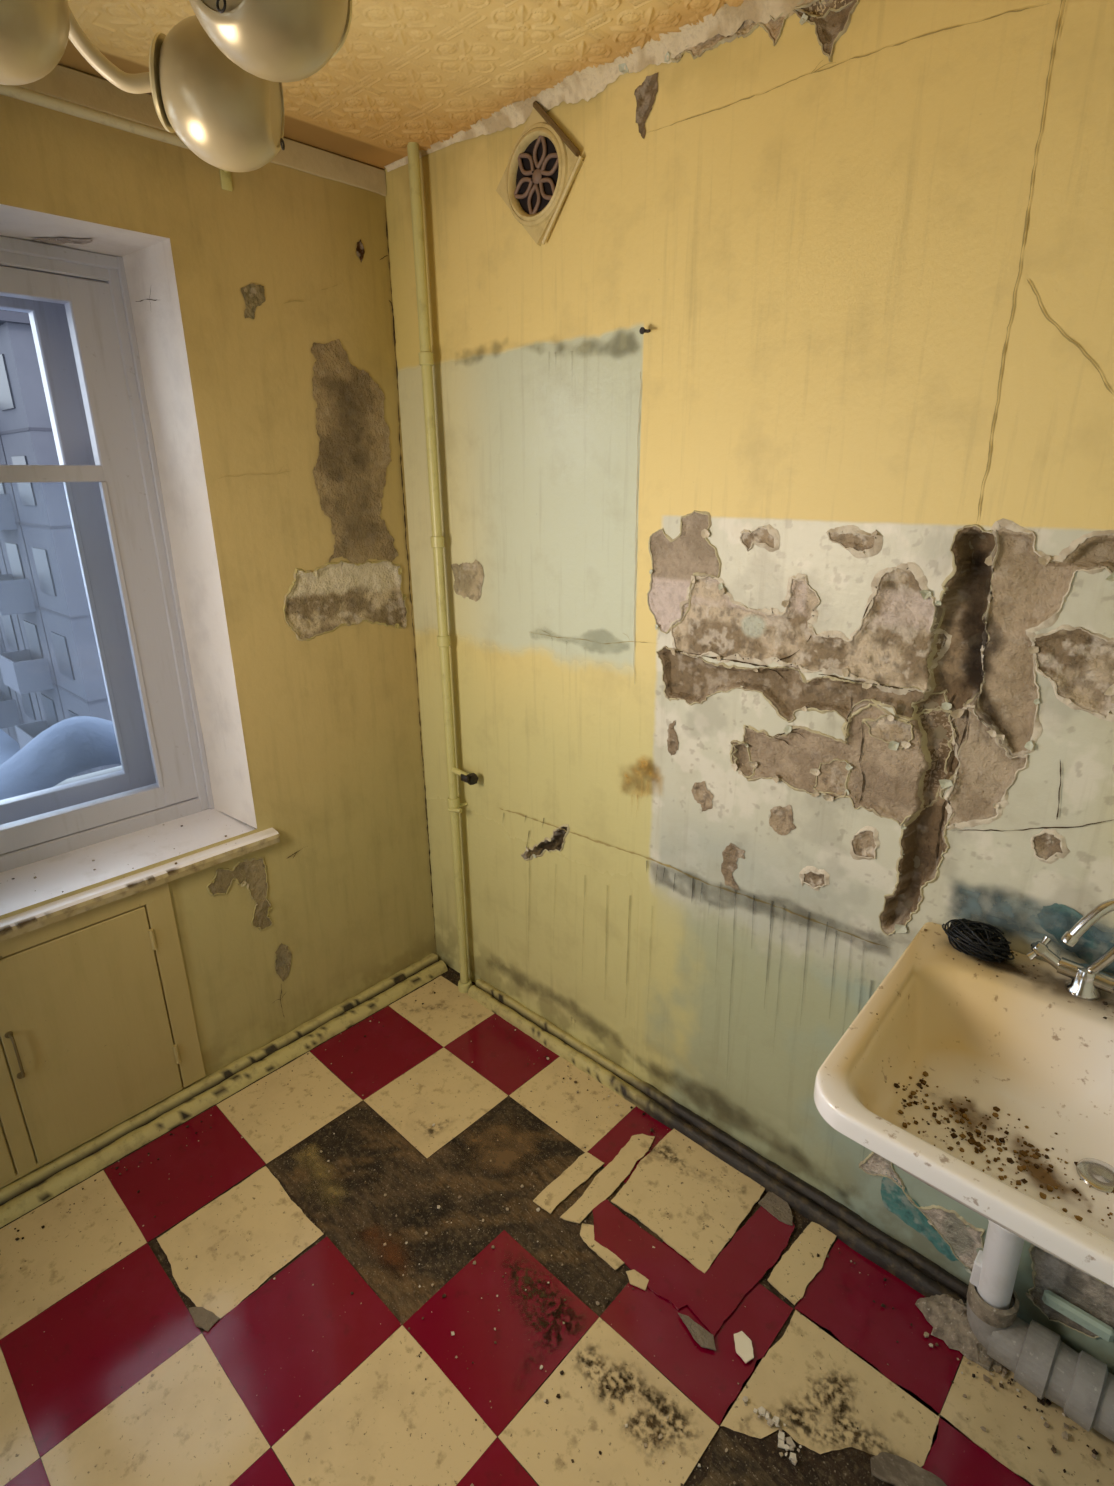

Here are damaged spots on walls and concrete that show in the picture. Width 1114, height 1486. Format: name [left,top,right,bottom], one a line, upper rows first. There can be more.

peeling [618,0,860,139]
crack [647,0,1112,523]
peeling [283,339,408,641]
flaking render [521,824,570,861]
crack [531,632,914,803]
flaking render [647,510,1114,936]
crack [935,691,1112,863]
peeling [267,1097,630,1325]
peeling [758,1207,812,1310]
flaking render [859,1152,985,1274]
flaking render [1026,1244,1114,1339]
peeling [698,1429,777,1486]